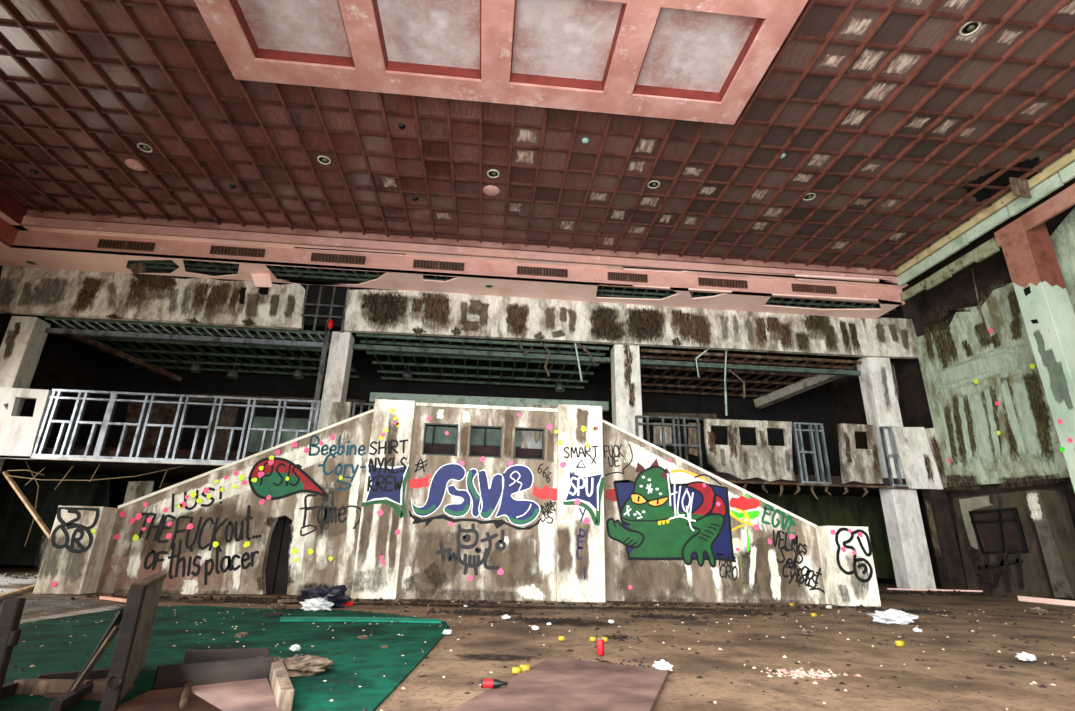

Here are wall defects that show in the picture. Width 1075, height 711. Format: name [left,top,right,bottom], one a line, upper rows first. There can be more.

leakage [239,287,295,318]
leakage [358,292,410,328]
leakage [460,300,489,331]
leakage [545,307,577,337]
leakage [591,306,665,342]
leakage [923,290,1073,468]
leakage [576,409,589,443]
leakage [274,433,347,469]
leakage [146,464,255,524]
leakage [285,483,335,586]
leakage [346,446,514,600]
leakage [529,514,590,580]